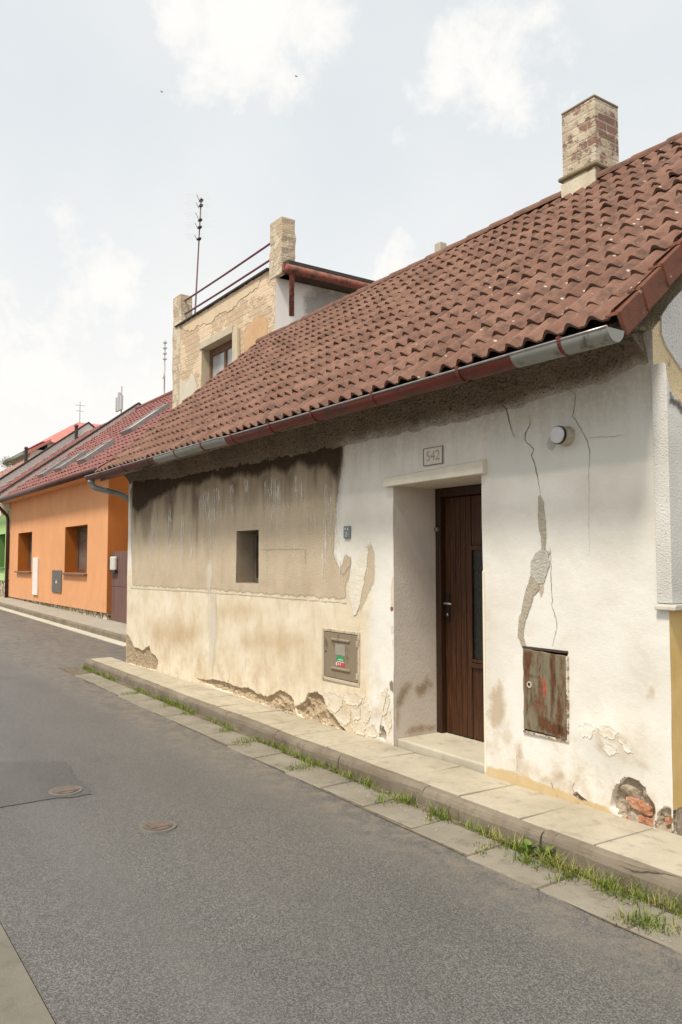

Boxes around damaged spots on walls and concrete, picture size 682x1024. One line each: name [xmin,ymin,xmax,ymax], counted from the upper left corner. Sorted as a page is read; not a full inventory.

flaking render [182,275,262,332]
flaking render [244,315,269,351]
crack [490,377,540,488]
crack [550,360,618,479]
water stain [132,446,342,567]
peeling [130,456,374,616]
spalling [127,636,158,670]
flaking render [201,679,393,740]
rust [540,658,564,737]
spalling [615,777,677,834]